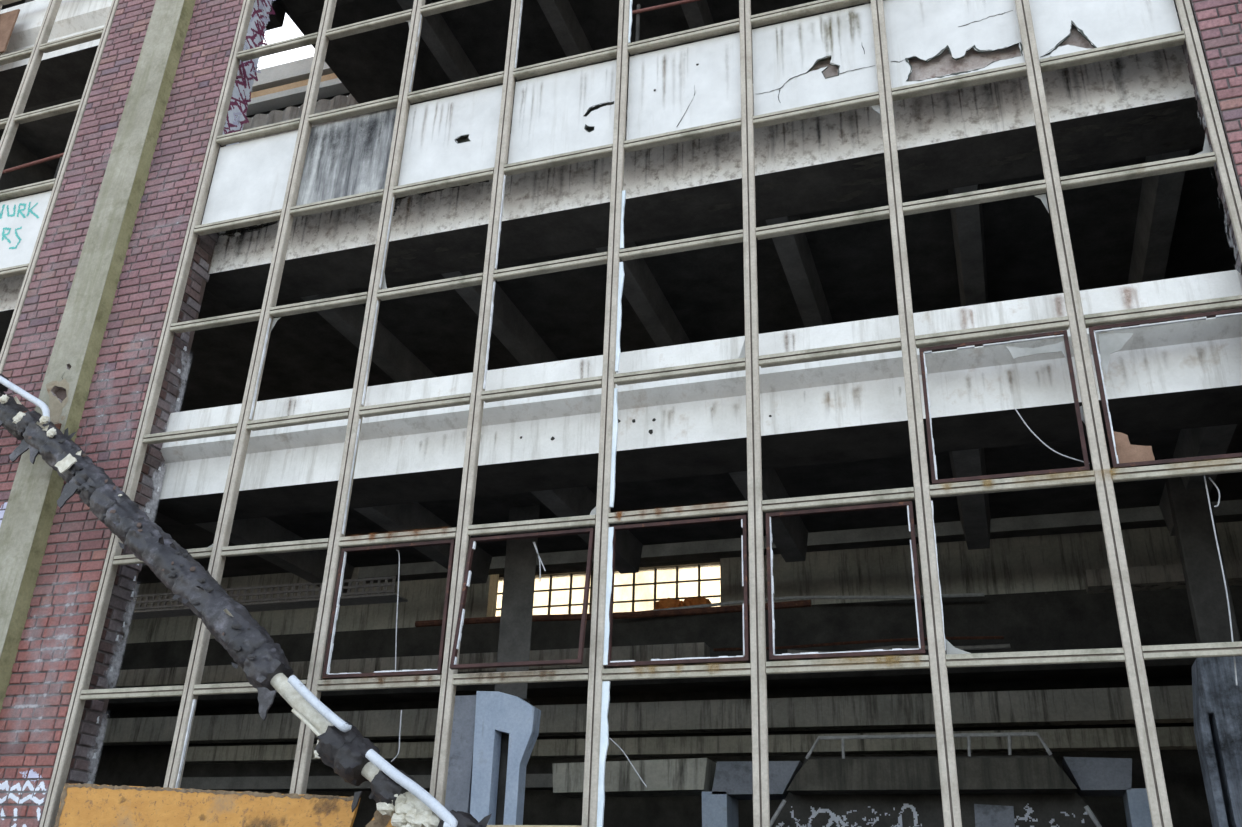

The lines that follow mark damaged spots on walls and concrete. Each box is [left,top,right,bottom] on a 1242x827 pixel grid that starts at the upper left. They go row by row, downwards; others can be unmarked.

spalling [1041,20,1097,57]
spalling [905,42,1025,81]